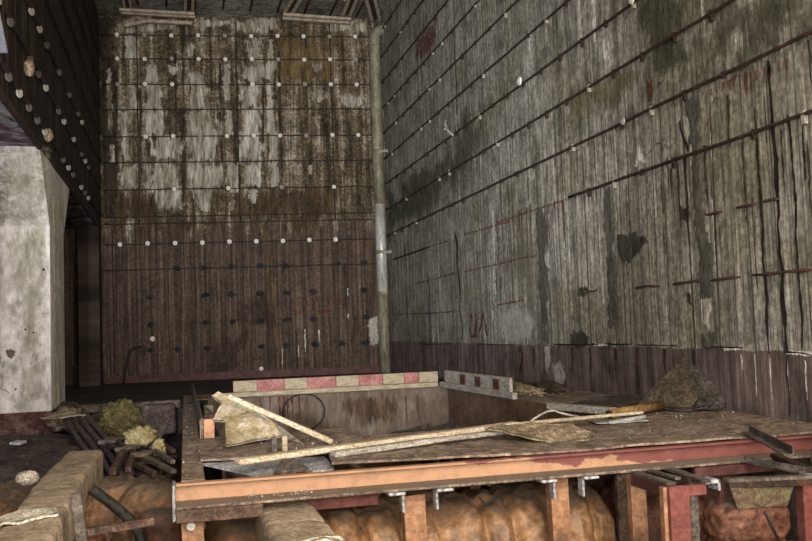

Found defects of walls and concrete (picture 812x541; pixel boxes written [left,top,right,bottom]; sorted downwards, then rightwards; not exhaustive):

leakage [98,17,124,217]
leakage [174,25,186,197]
leakage [271,30,341,174]
rust [711,58,788,95]
leakage [660,143,692,261]
leakage [703,133,717,267]
crack [754,60,810,417]
crack [553,340,677,348]